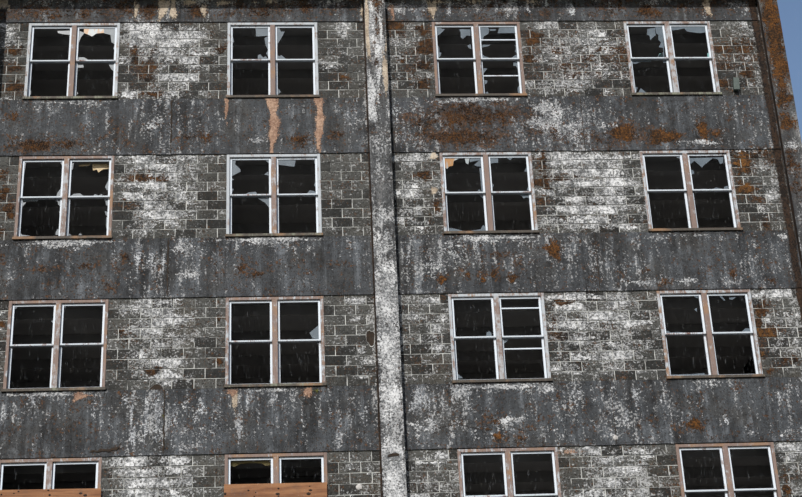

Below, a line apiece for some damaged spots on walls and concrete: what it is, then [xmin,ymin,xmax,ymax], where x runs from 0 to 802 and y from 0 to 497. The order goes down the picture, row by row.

rust [266,98,281,153]
rust [314,98,324,153]
rust [748,0,802,323]